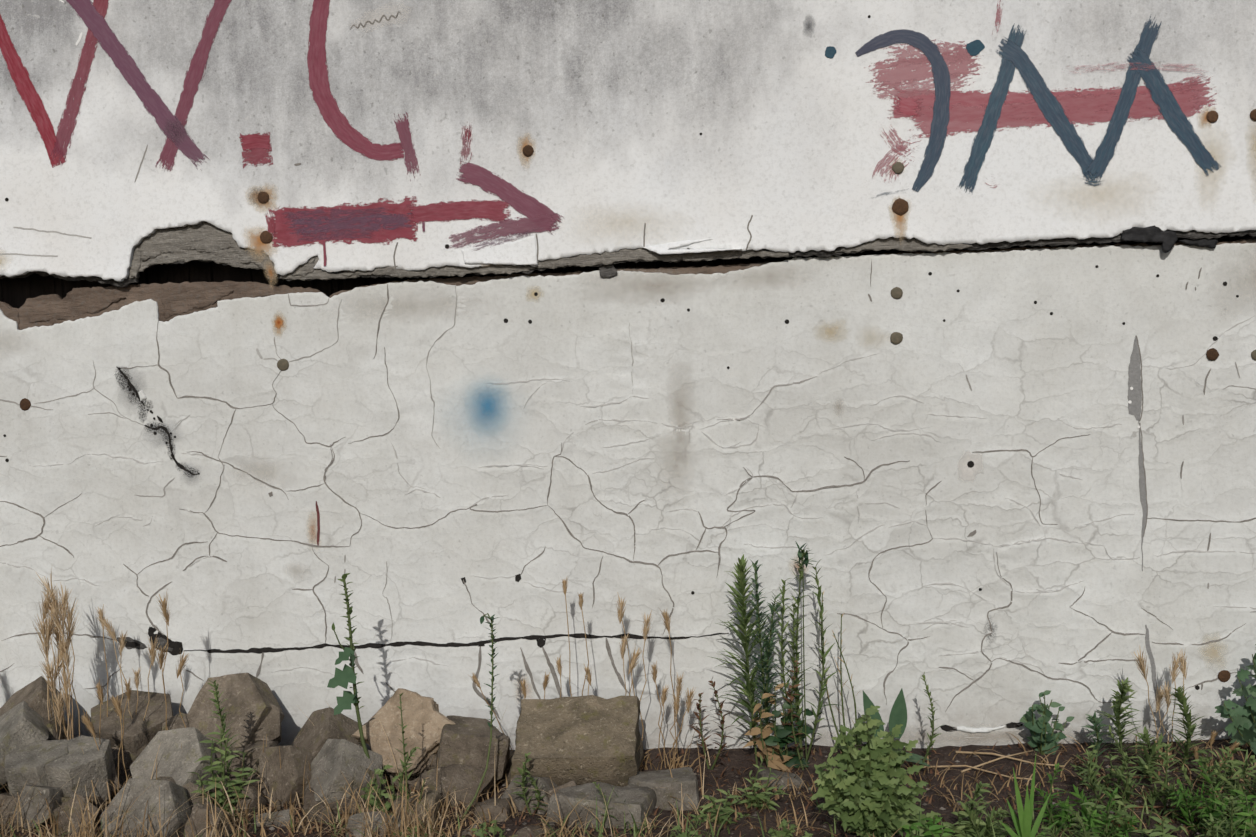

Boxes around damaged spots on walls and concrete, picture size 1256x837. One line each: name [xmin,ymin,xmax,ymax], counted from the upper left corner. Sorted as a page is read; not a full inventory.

corrosion [275,316,284,333]
spalling [0,221,789,330]
crack [1224,362,1256,390]
crack [0,242,909,720]
crack [972,434,1090,525]
crack [1147,516,1256,524]
crack [837,481,941,705]
crack [939,552,1256,729]